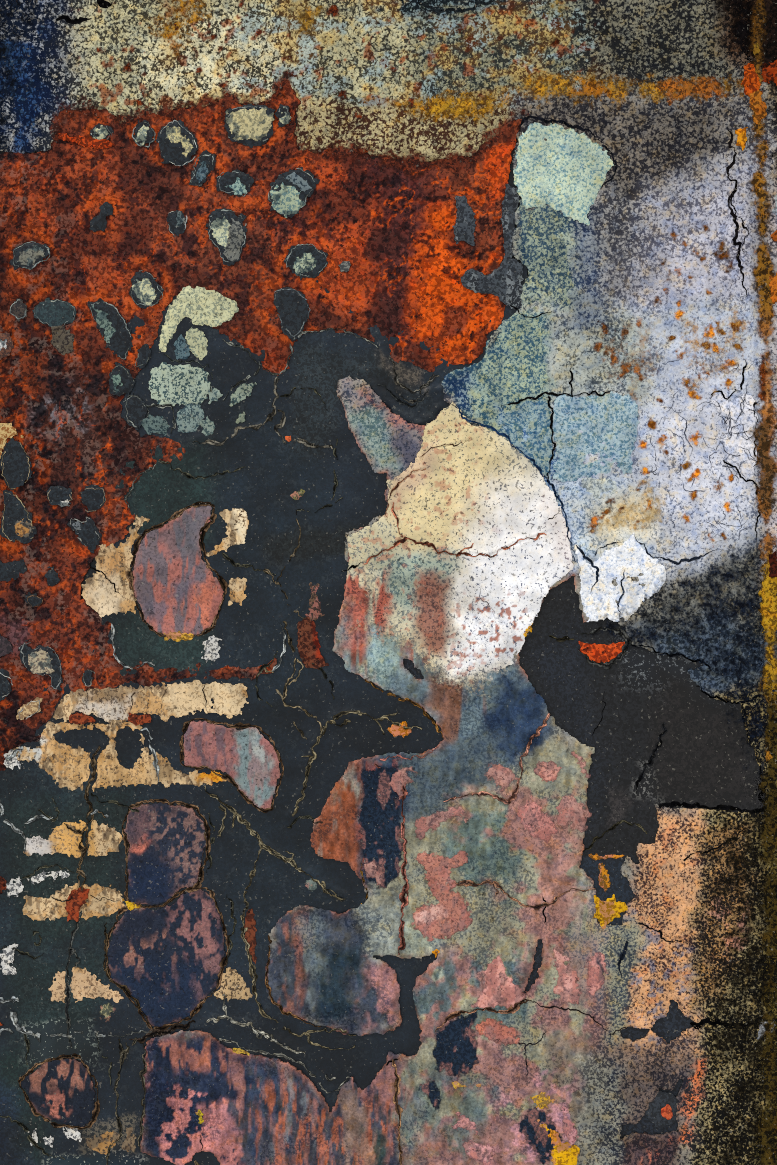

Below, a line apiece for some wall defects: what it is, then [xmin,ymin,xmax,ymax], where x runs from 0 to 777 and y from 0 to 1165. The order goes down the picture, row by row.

corrosion [670,232,733,273]
crack [726,130,752,308]
crack [509,304,552,318]
corrosion [0,55,527,771]
corrosion [594,321,644,381]
corrosion [639,420,671,455]
corrosion [683,369,709,399]
corrosion [701,321,742,389]
corrosion [682,461,701,500]
corrosion [735,0,777,1165]
peeling [0,286,766,1165]
crack [0,328,777,1165]